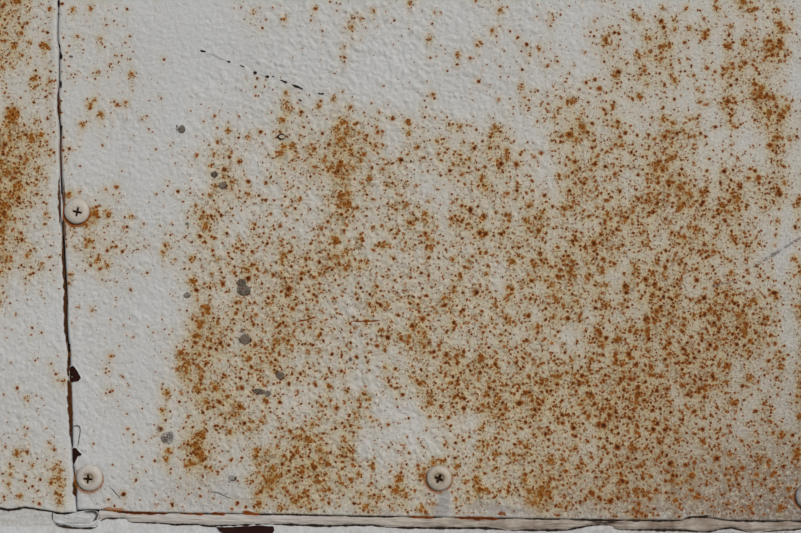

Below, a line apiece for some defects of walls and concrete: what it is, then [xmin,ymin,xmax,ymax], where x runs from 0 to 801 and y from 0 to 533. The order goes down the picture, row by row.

rust [0,426,104,505]
peeling [215,524,275,533]